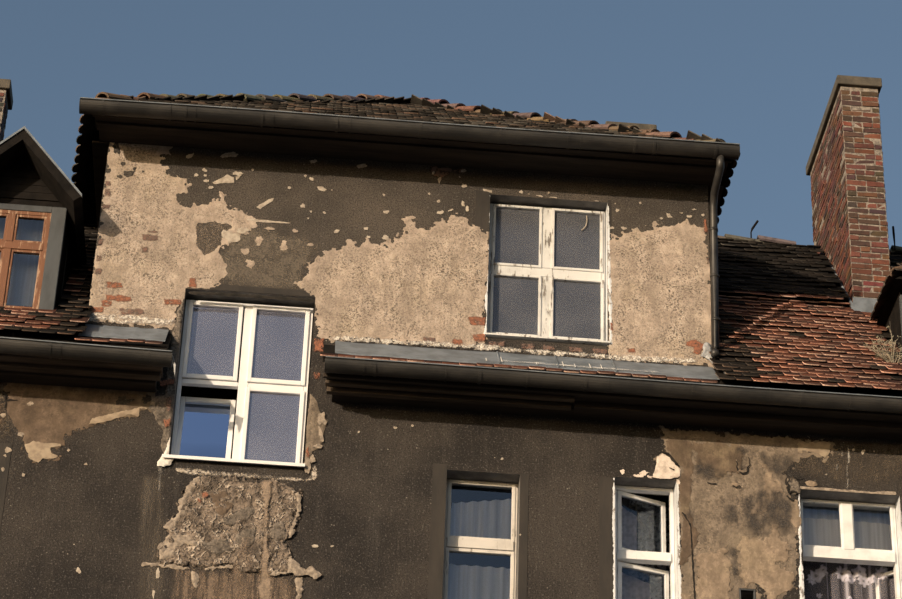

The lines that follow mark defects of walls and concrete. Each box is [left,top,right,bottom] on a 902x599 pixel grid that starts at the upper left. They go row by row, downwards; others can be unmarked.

flaking render [0,142,504,473]
flaking render [569,203,715,369]
flaking render [141,475,322,599]
flaking render [654,425,902,599]